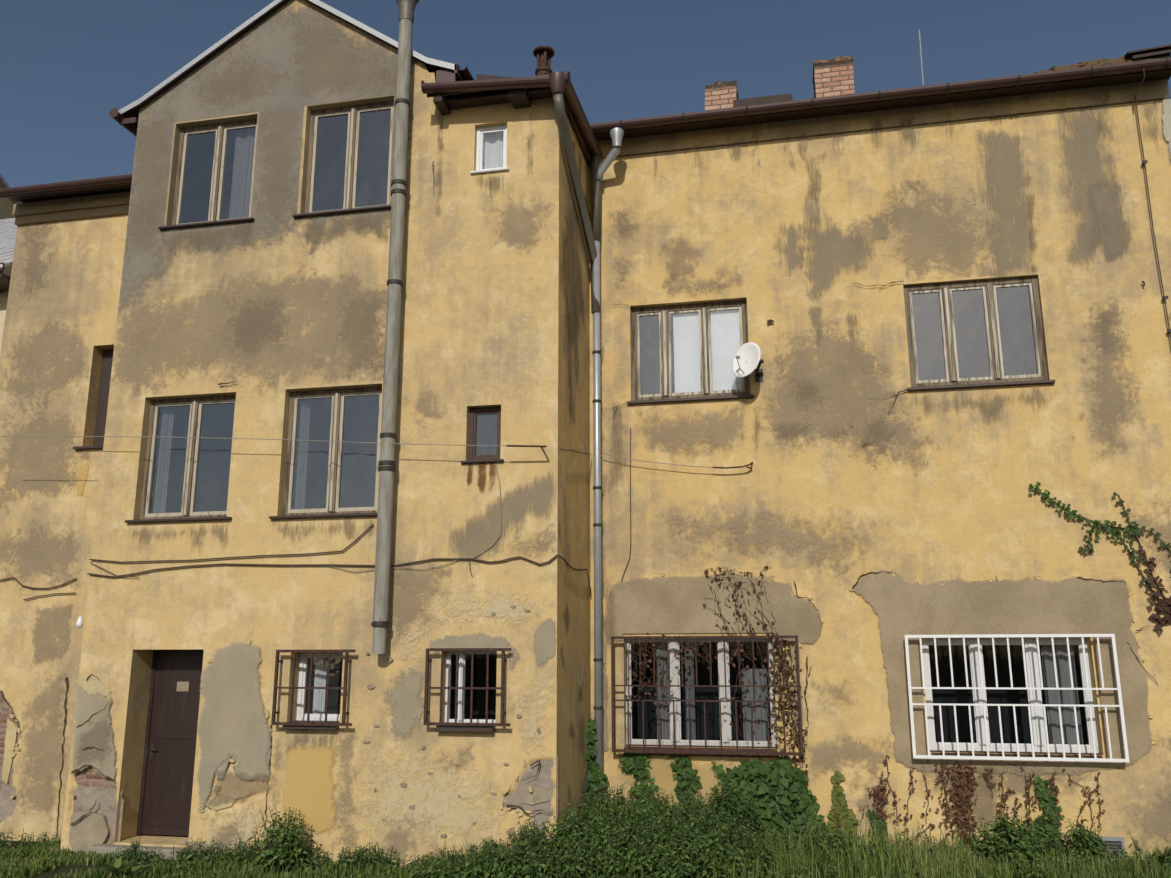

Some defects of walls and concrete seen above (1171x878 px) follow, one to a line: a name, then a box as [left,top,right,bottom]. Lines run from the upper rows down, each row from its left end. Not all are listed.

leakage [113,4,417,394]
leakage [1061,106,1129,262]
flaking render [1162,91,1171,158]
leakage [563,206,584,419]
leakage [643,117,1034,466]
leakage [1082,303,1138,455]
rust [467,462,495,492]
flaking render [0,690,21,823]
flaking render [69,674,124,852]
flaking render [184,640,273,855]
flaking render [490,756,558,832]